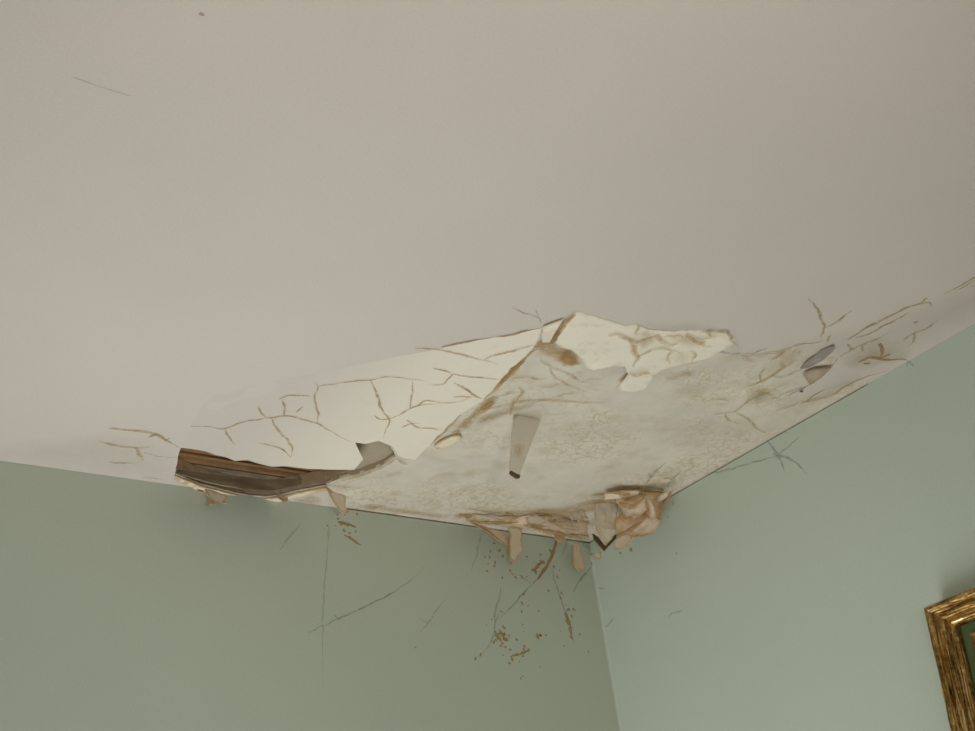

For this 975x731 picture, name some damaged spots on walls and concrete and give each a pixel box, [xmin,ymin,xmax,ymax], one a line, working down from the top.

crack [129,430,171,479]
crack [205,395,337,452]
crack [344,315,574,441]
spalling [174,311,868,571]
crack [756,304,845,398]
crack [783,298,926,409]
crack [533,540,557,583]